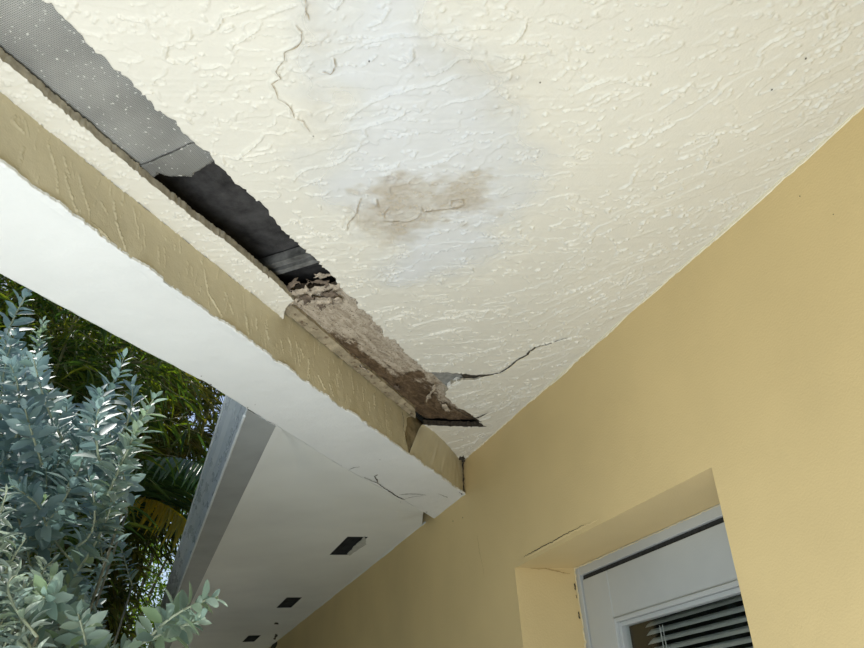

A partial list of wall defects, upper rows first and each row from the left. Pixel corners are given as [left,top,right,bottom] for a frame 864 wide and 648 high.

crack [272,0,309,130]
peeling [286,272,343,311]
crack [461,338,566,378]
crack [351,462,464,500]